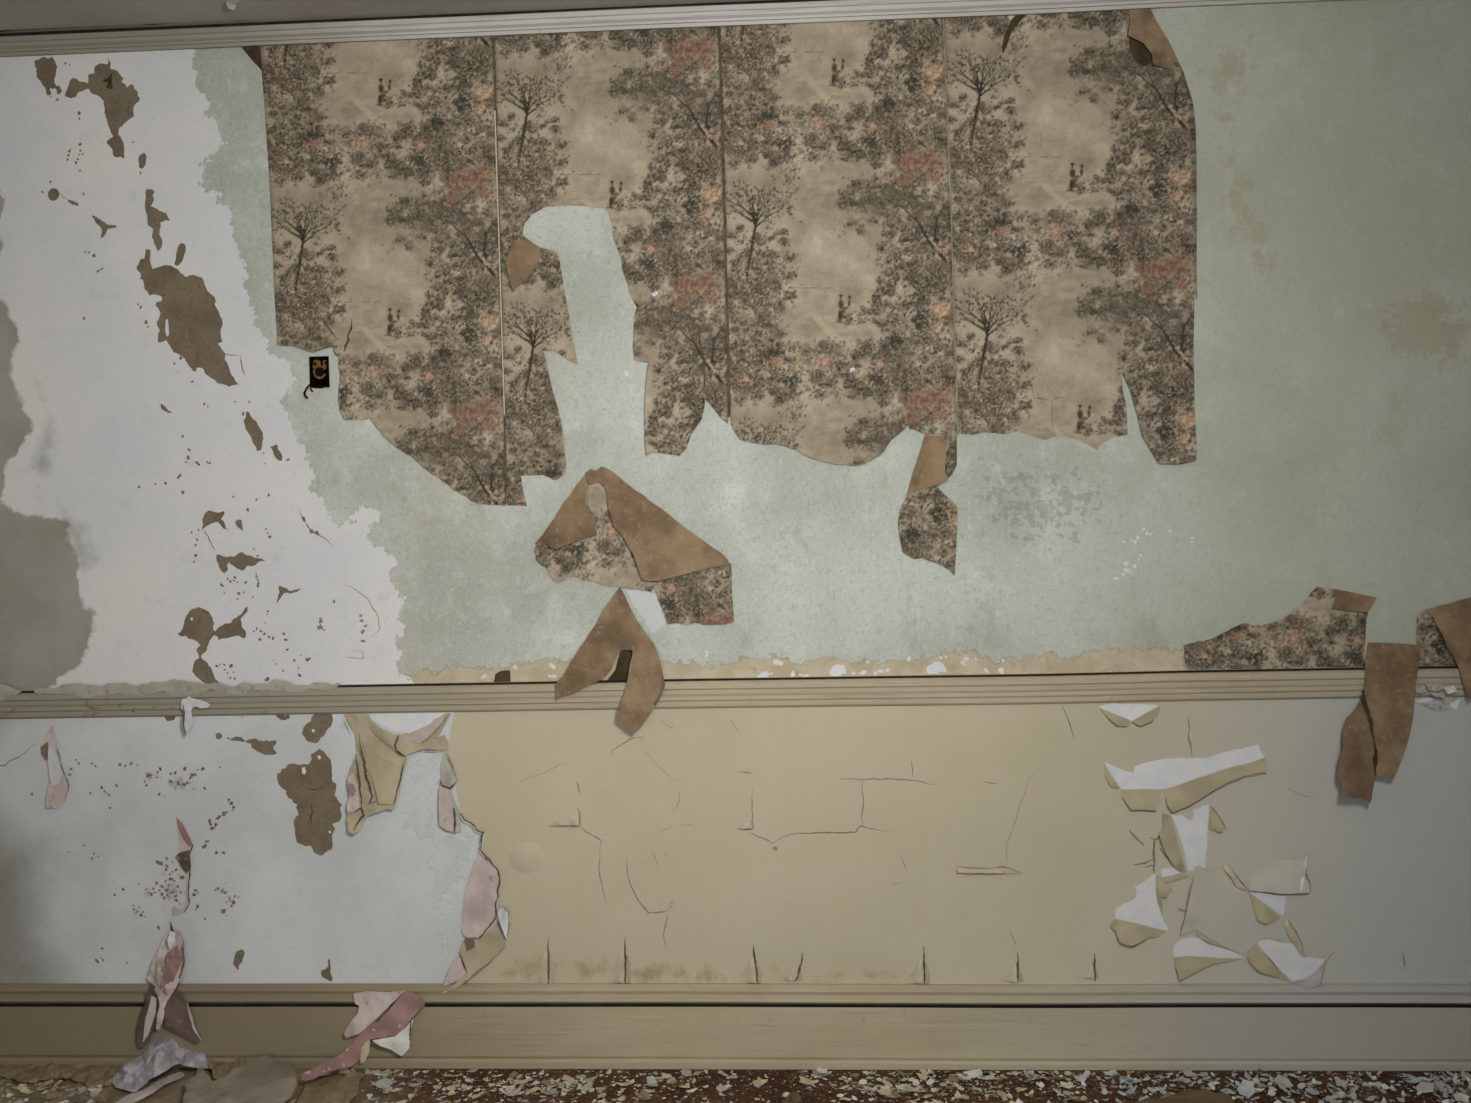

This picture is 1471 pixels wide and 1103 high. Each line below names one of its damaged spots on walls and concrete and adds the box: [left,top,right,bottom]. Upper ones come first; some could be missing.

flaking render [0,49,510,996]
flaking render [625,588,666,633]
peeling [758,659,809,677]
peeling [829,660,890,676]
peeling [927,656,1005,674]
peeling [1099,703,1160,727]
peeling [1416,682,1460,711]
crack [582,720,694,947]
crack [744,761,927,884]
crack [987,769,1039,866]
peeling [1104,744,1335,989]